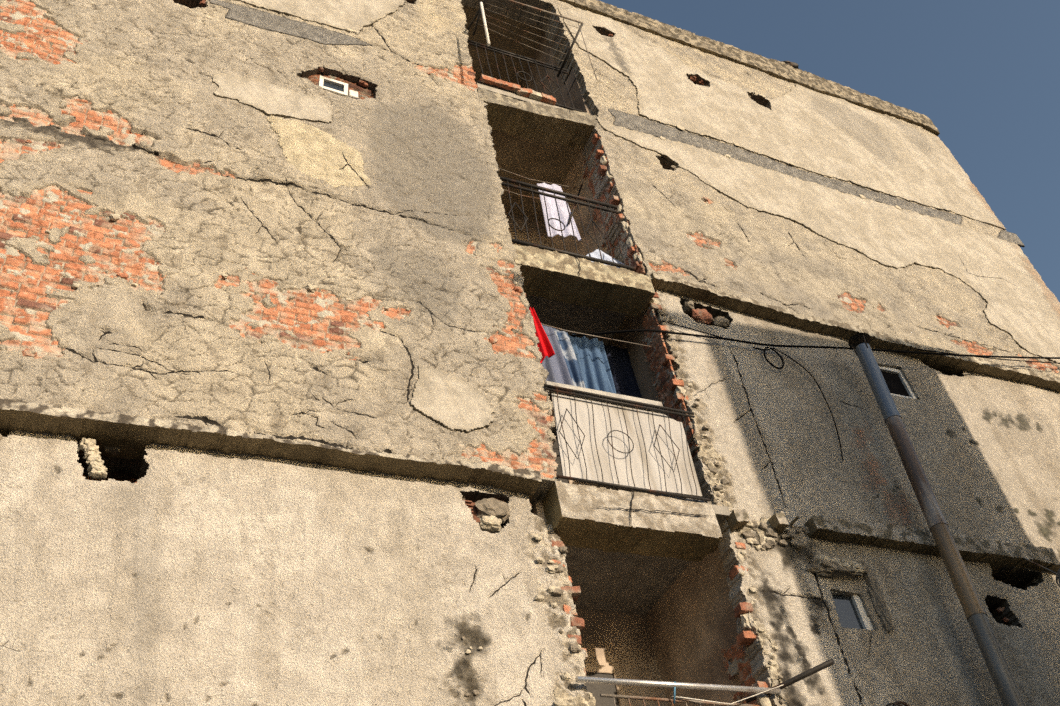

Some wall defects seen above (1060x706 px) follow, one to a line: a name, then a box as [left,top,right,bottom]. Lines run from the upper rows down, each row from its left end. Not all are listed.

flaking render [0,96,235,178]
crack [87,127,159,157]
crack [188,128,471,261]
peeling [558,8,1060,373]
flaking render [0,185,166,367]
spalling [79,438,138,483]
crack [66,330,232,379]
crack [176,415,223,427]
crack [258,367,392,454]
crack [381,331,415,403]
peeling [410,365,559,478]
flaking render [641,292,734,512]